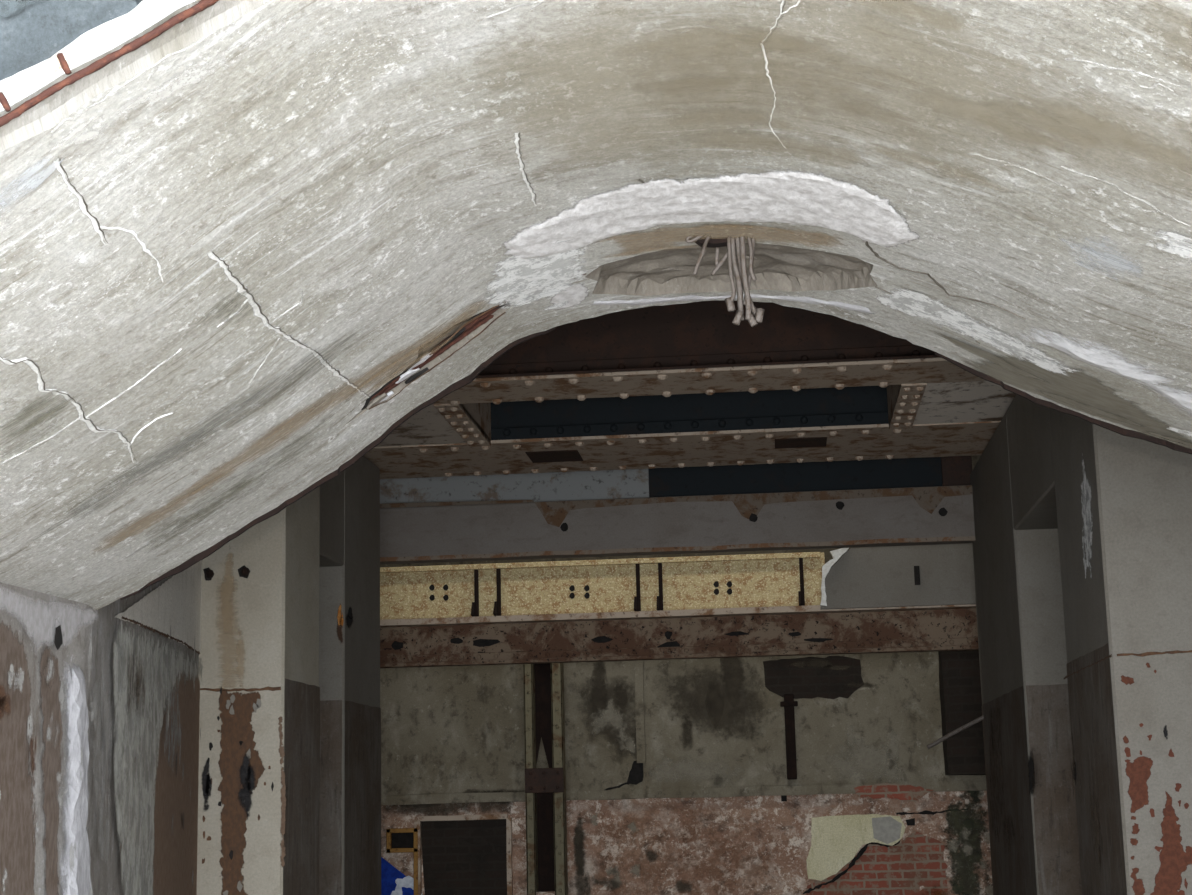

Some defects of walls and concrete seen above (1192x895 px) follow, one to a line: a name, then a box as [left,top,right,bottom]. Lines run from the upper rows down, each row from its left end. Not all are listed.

spalling [0,0,272,151]
crack [761,0,800,149]
crack [0,349,182,463]
crack [53,159,163,282]
crack [207,251,370,398]
spalling [344,296,518,426]
spalling [585,243,877,314]
flaking render [806,831,948,895]